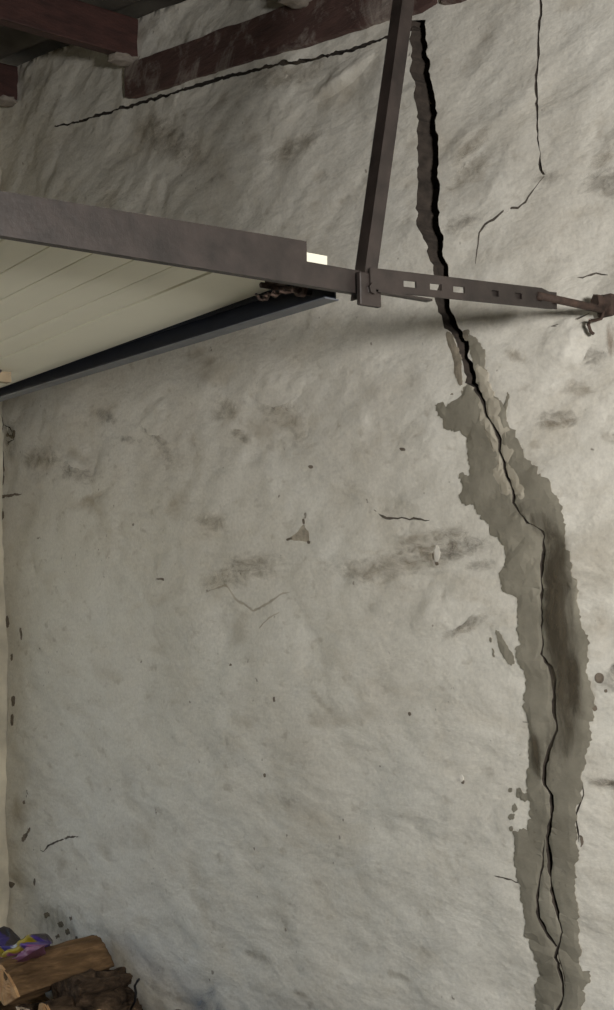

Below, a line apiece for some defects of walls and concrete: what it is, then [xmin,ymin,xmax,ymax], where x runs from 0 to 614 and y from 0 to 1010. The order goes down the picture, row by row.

crack [55,35,388,127]
spalling [446,330,469,395]
spalling [286,519,310,544]
crack [374,510,429,521]
crack [410,0,584,1010]
crack [207,584,290,628]
peeling [489,630,515,666]
peeling [508,788,528,831]
crack [40,836,78,852]